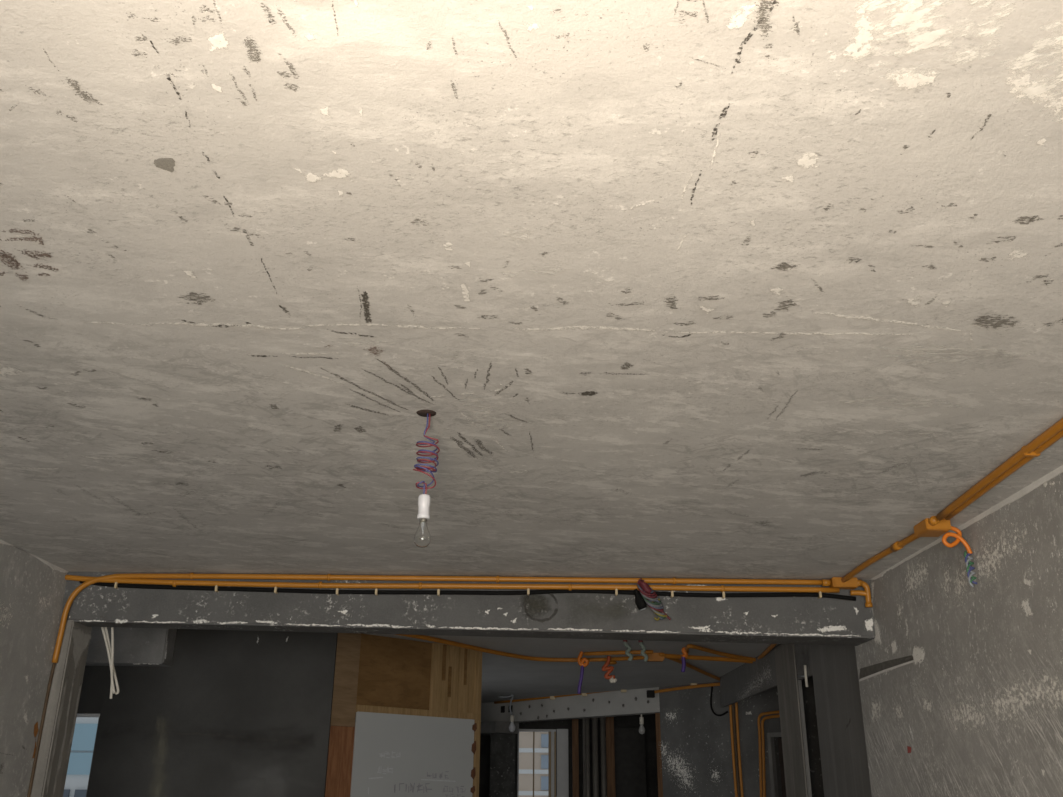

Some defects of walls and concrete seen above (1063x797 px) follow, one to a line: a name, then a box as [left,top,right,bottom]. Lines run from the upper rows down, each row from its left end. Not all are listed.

crack [733,0,776,68]
peeling [843,0,1015,90]
peeling [1005,21,1063,124]
crack [682,104,730,204]